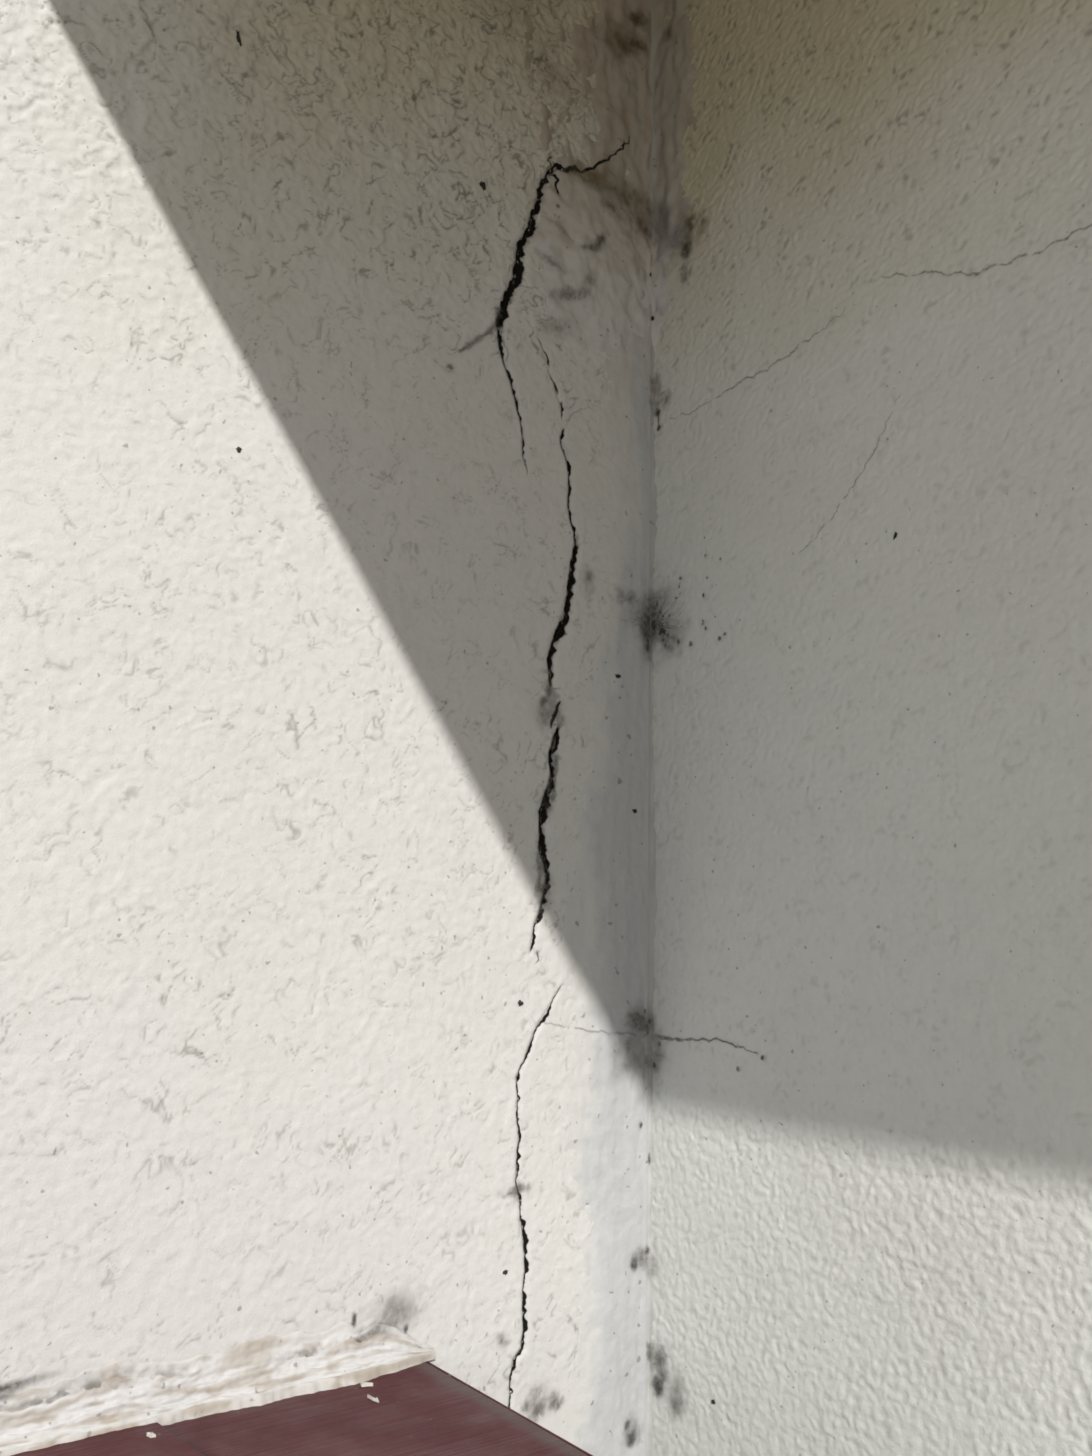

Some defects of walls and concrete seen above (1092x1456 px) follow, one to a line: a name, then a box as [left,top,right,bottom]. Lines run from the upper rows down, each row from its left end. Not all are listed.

crack [447,136,630,473]
leakage [644,577,692,650]
crack [500,340,591,1408]
crack [658,1035,757,1053]